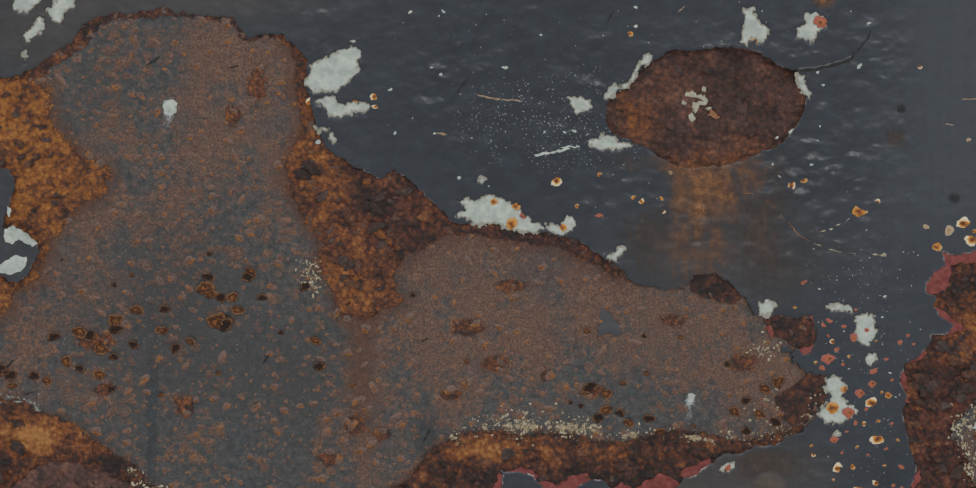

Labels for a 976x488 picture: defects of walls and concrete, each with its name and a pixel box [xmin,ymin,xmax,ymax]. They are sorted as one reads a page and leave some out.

peeling [12,0,75,65]
peeling [741,6,770,47]
peeling [304,45,370,144]
corrosion [606,47,806,235]
peeling [0,167,40,282]
peeling [455,194,576,236]
corrosion [764,314,817,355]
corrosion [830,217,976,488]
corrosion [775,374,827,425]
peeling [816,374,859,437]
corrosion [0,397,157,488]
corrosion [391,425,803,488]